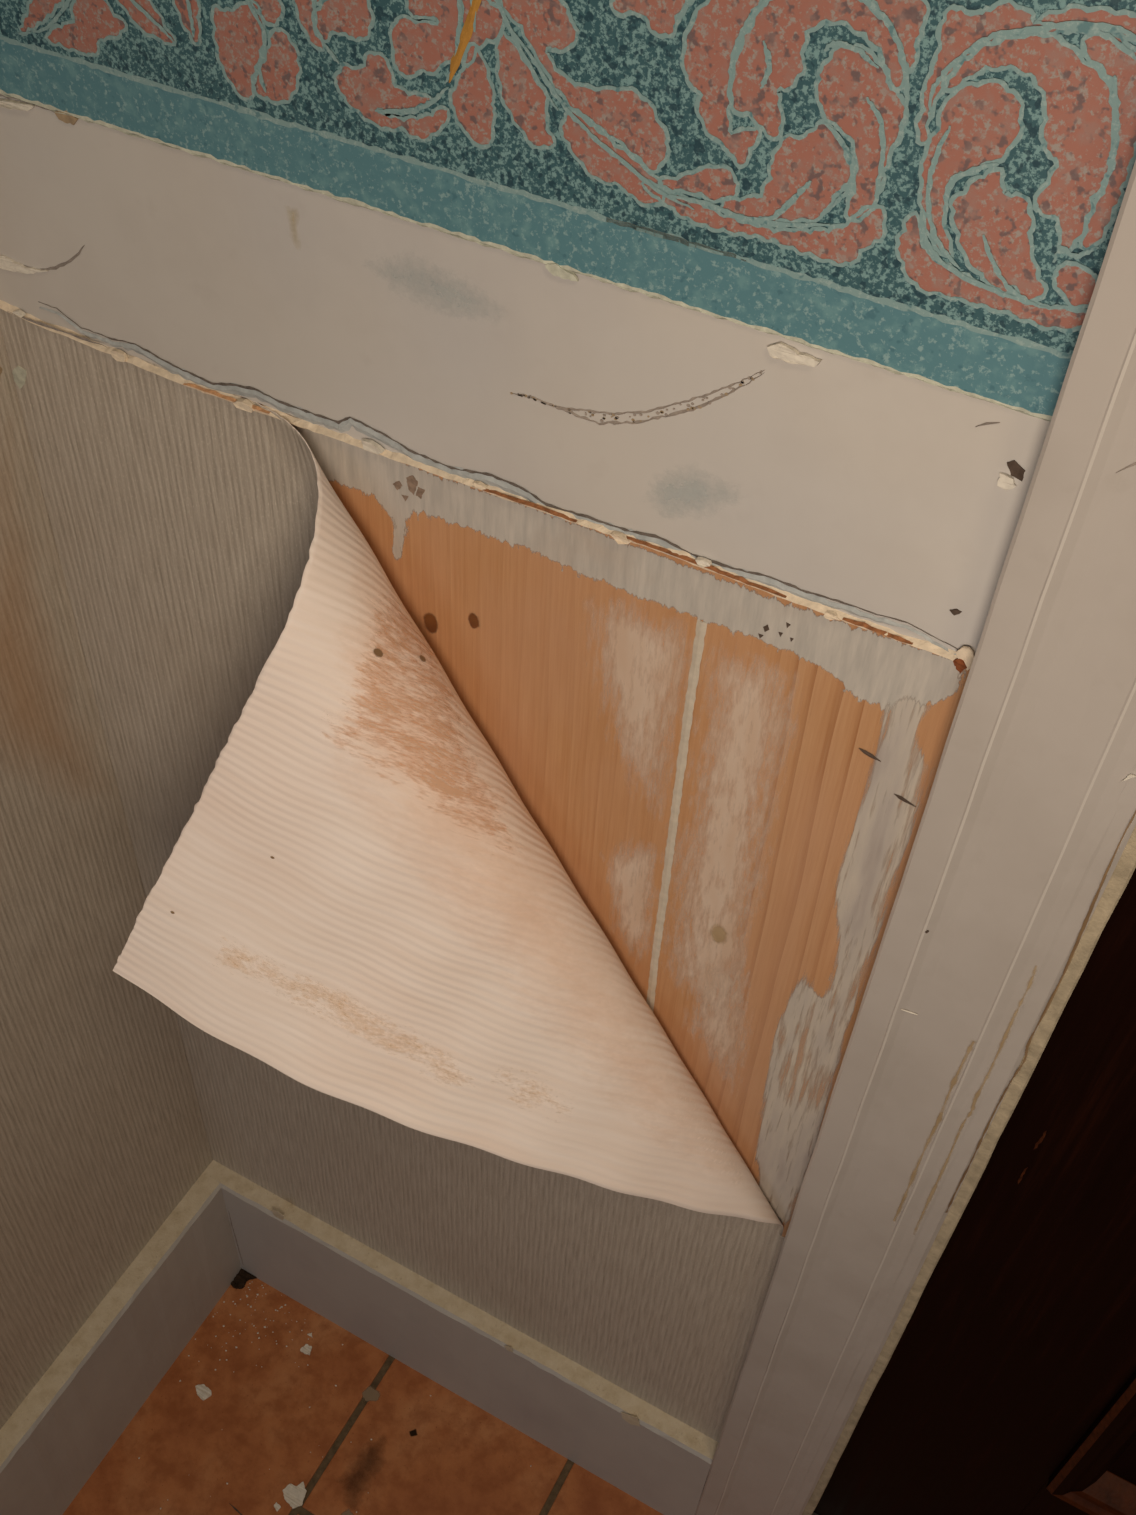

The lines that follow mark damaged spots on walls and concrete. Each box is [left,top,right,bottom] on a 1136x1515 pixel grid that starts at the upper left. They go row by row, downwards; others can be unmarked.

crack [0,246,959,661]
peeling [113,397,974,1236]